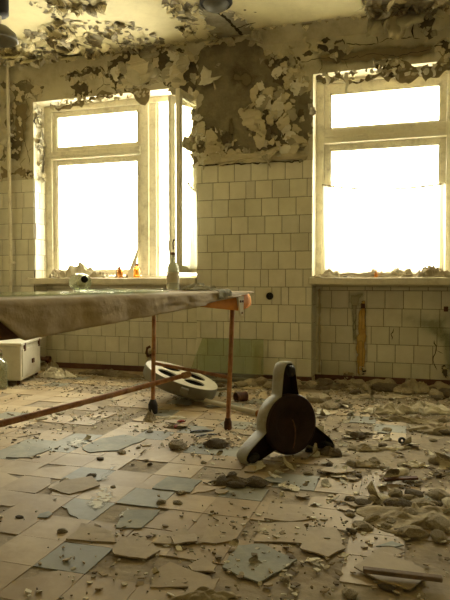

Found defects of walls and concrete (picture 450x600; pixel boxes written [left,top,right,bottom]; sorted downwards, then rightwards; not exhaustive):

peeling [0,0,450,184]
crack [217,13,256,35]